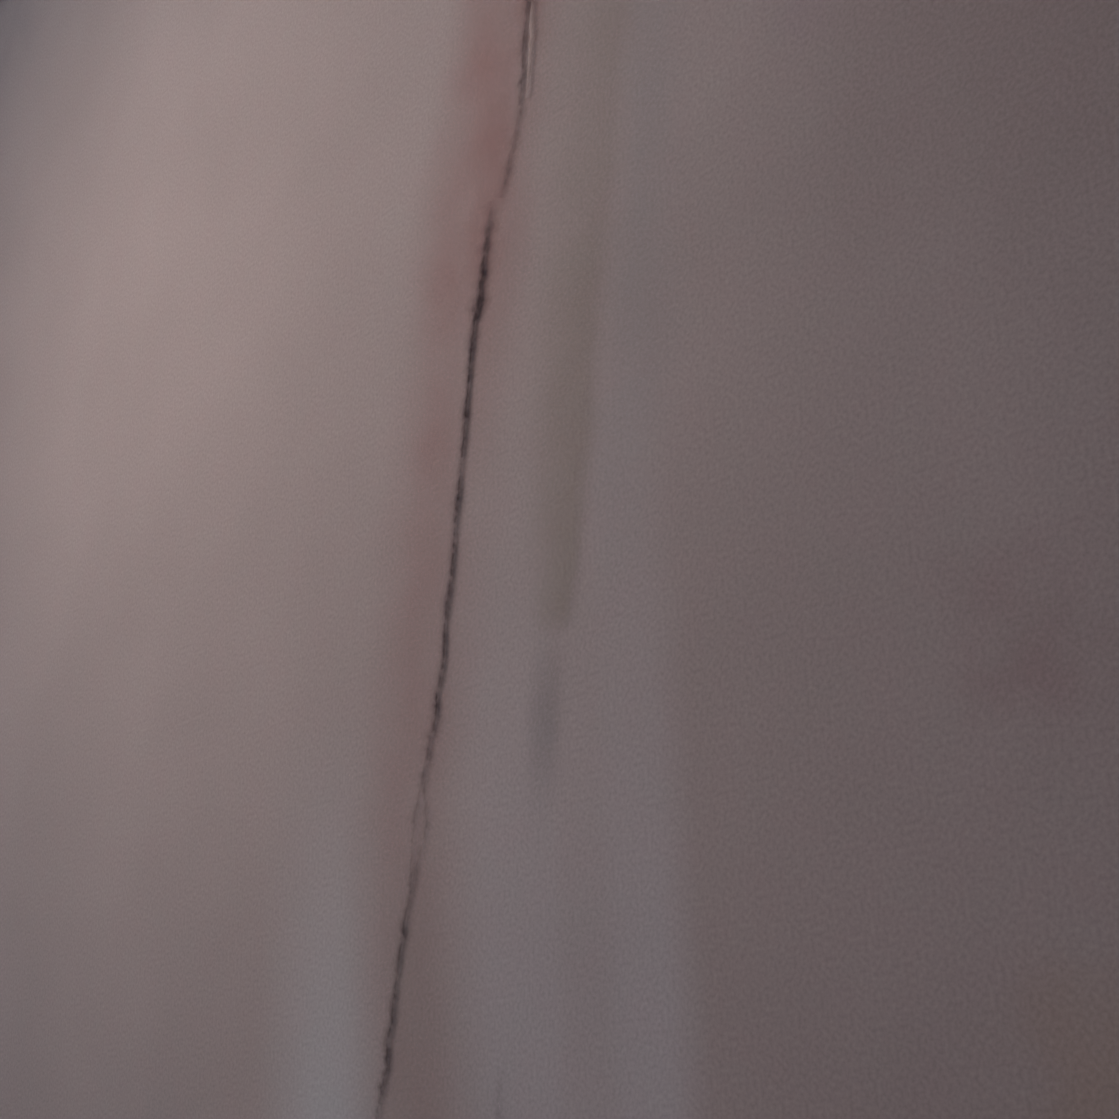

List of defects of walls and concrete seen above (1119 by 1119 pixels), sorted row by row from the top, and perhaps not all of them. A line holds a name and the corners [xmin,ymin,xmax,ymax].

crack [520,3,531,91]
crack [427,228,489,757]
crack [380,924,405,1093]